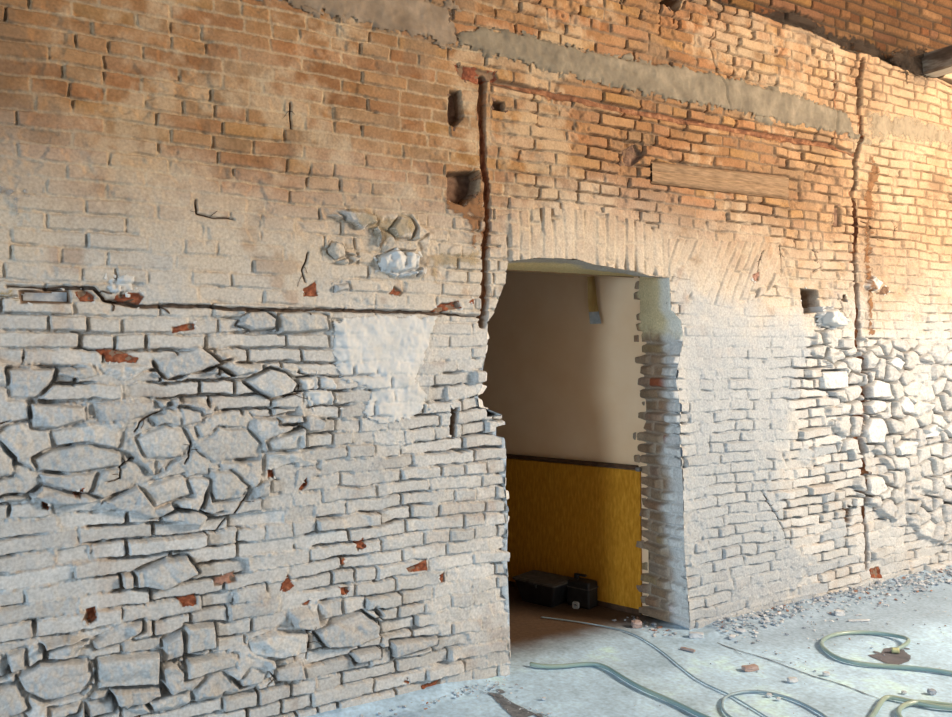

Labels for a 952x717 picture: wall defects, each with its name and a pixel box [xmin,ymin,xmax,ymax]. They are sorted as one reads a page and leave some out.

rust [850,157,880,335]
crack [10,254,475,317]
crack [135,412,158,430]
crack [213,485,254,531]